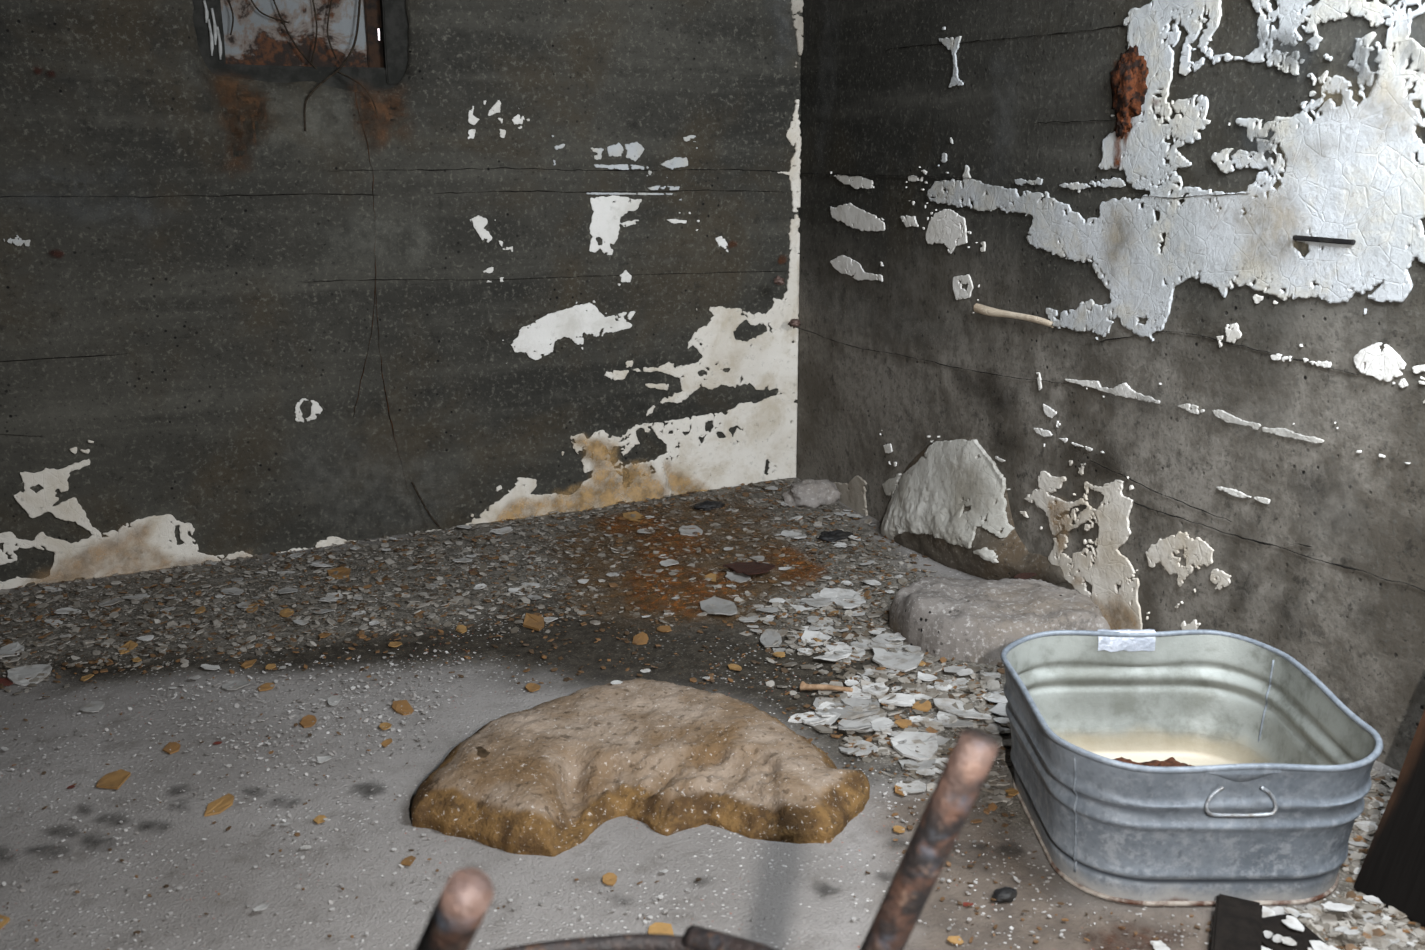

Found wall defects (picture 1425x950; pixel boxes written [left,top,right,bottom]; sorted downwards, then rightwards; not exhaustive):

rust [1114,108,1132,167]
peeling [830,0,1425,341]
peeling [425,99,1231,630]
crack [796,327,1055,383]
peeling [1216,323,1242,348]
peeling [1270,344,1332,368]
peeling [0,440,359,611]
crack [1089,460,1425,592]
peeling [45,607,82,638]
peeling [293,592,380,625]
peeling [726,556,1012,776]